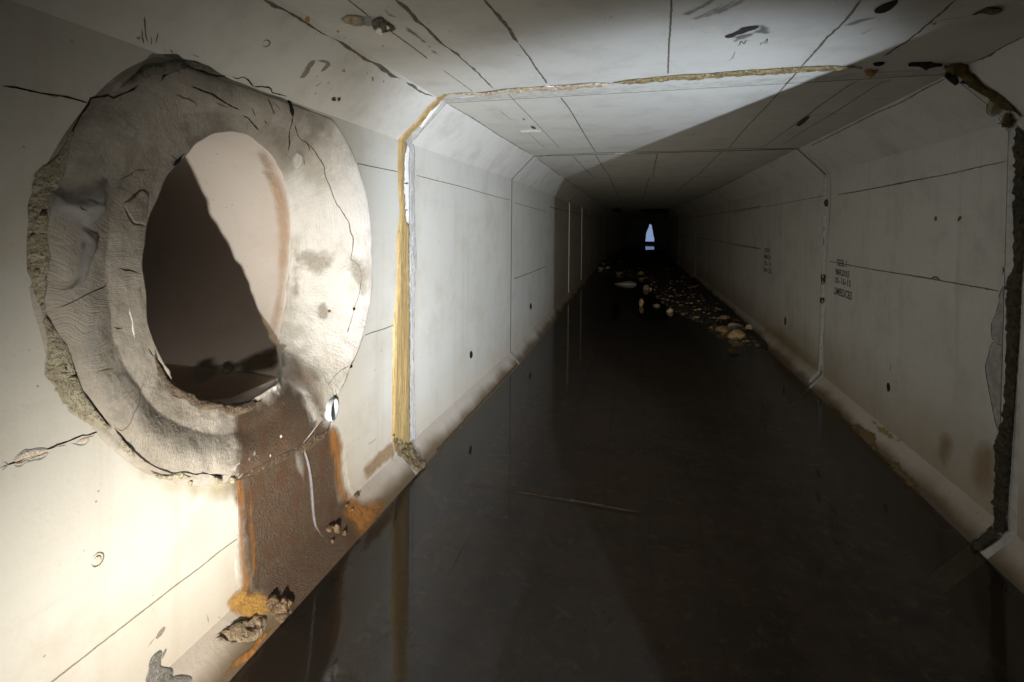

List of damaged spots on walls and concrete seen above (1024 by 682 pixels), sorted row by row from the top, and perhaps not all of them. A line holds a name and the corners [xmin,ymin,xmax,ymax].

spalling [342,15,395,35]
crack [4,70,364,384]
spalling [154,355,263,416]
spalling [970,126,1024,552]
rust [228,422,381,619]
rust [231,629,272,669]